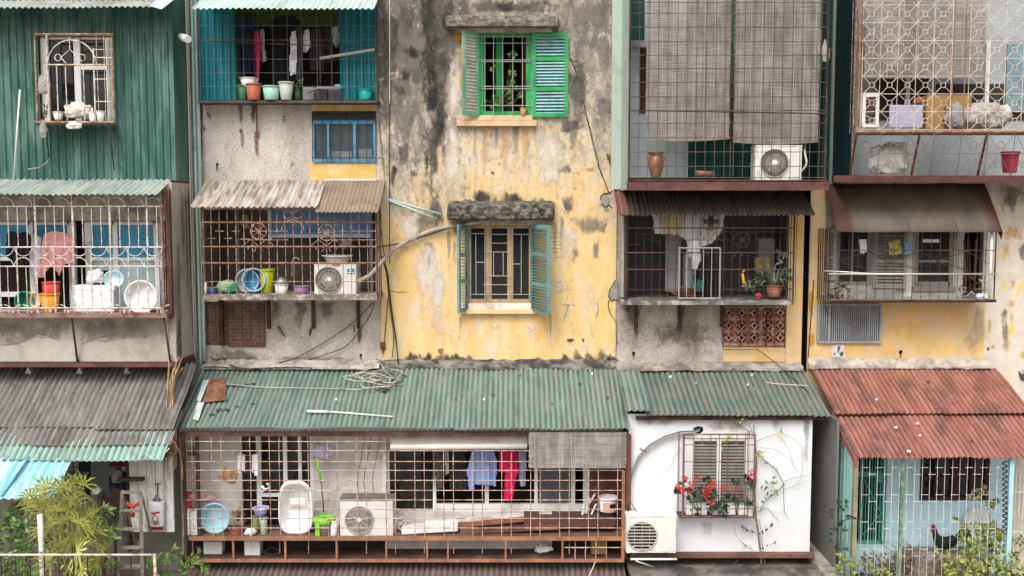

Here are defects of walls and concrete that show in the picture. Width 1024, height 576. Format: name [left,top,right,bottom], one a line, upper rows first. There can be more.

rust [251,105,259,155]
leakage [382,0,555,264]
peeling [401,212,420,250]
peeling [415,246,444,327]
leakage [654,325,705,346]
leakage [406,353,473,361]
leakage [563,351,618,361]